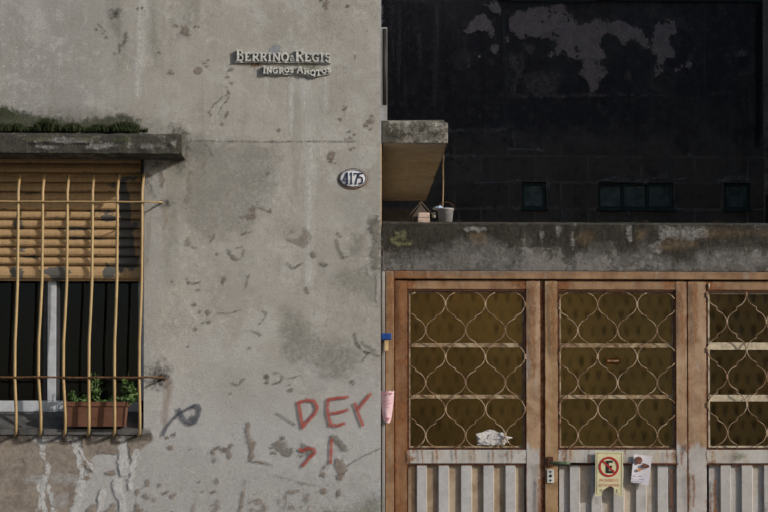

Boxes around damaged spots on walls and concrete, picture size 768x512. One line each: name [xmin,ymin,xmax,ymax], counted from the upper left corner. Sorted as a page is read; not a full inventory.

peeling [463,0,677,93]
water stain [381,220,756,263]
water stain [3,432,151,512]